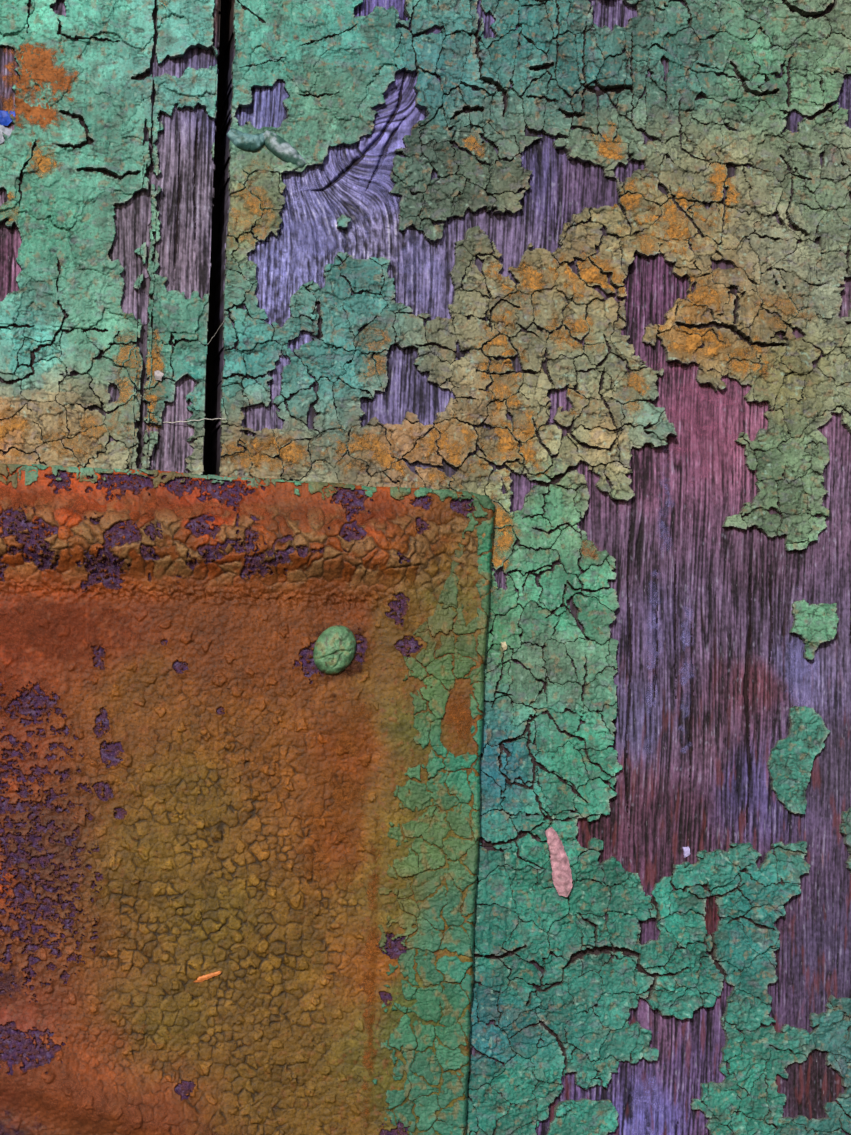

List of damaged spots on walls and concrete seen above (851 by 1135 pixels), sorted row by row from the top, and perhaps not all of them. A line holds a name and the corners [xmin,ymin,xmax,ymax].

crack [450,0,633,122]
crack [18,111,140,207]
peeling [0,0,220,485]
crack [0,258,136,384]
crack [421,299,624,487]
peeling [0,506,174,593]
peeling [45,465,255,511]
peeling [219,0,851,1135]
corrosion [341,653,362,676]
crack [479,520,694,869]
peeling [0,672,127,1003]
crack [510,912,726,1067]